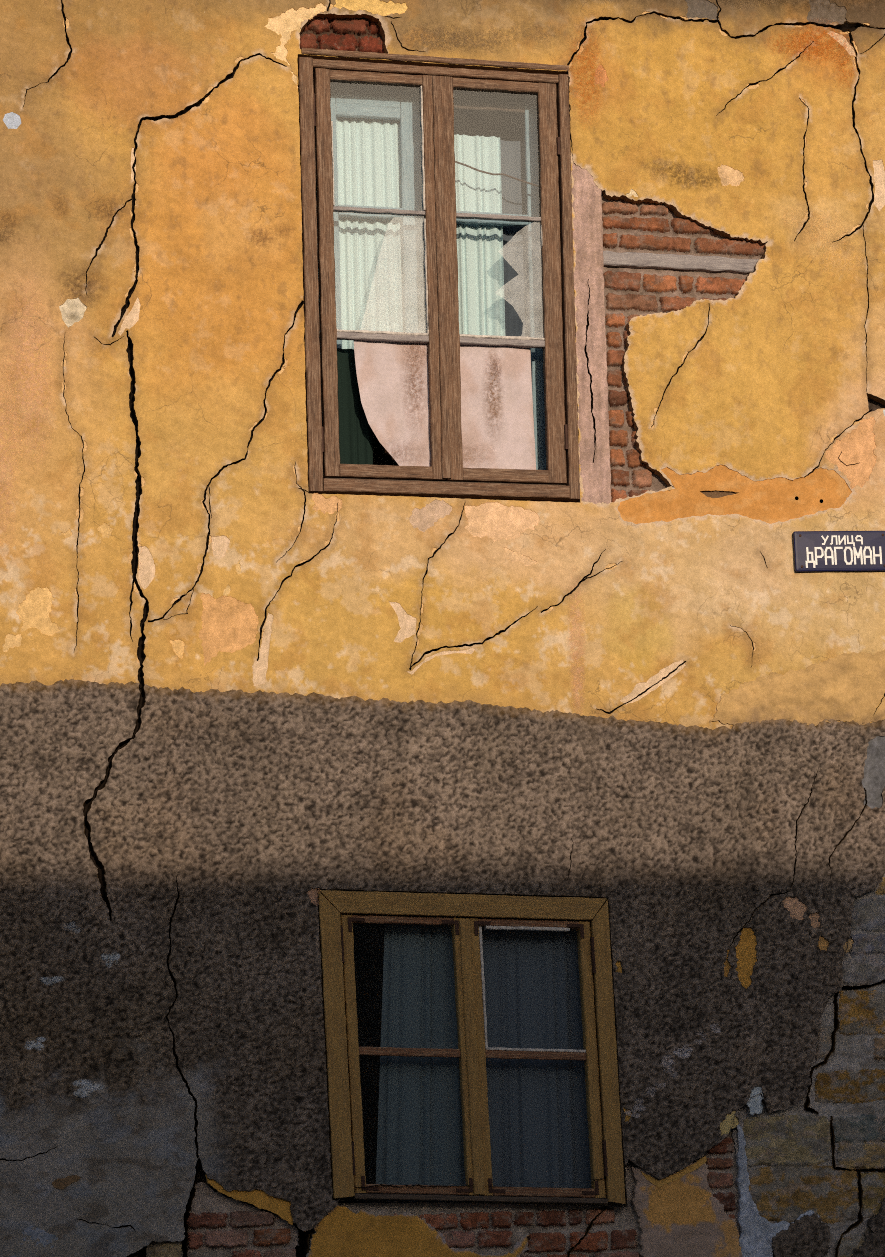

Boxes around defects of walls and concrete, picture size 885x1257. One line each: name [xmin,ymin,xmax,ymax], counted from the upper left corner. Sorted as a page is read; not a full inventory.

crack [23,0,72,107]
spalling [265,0,408,88]
crack [566,0,885,477]
spalling [571,161,885,524]
crack [61,53,304,921]
crack [252,462,340,686]
crack [389,503,622,674]
crack [165,876,199,1257]
spalling [146,1174,316,1257]
crack [296,1228,313,1257]
spalling [327,874,885,1257]
crack [804,979,885,1257]